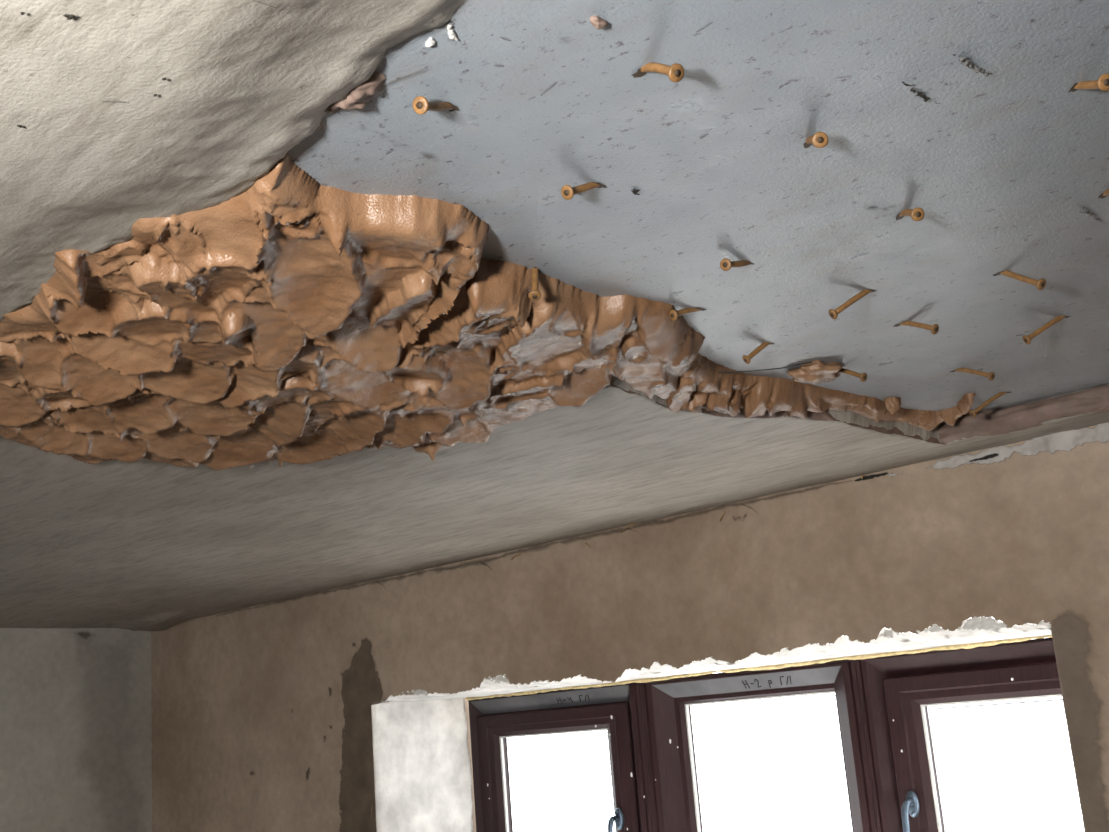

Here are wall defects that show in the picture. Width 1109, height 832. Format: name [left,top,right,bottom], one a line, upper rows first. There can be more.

spalling [953,55,992,76]
flaking render [315,71,392,132]
spalling [928,422,1109,469]